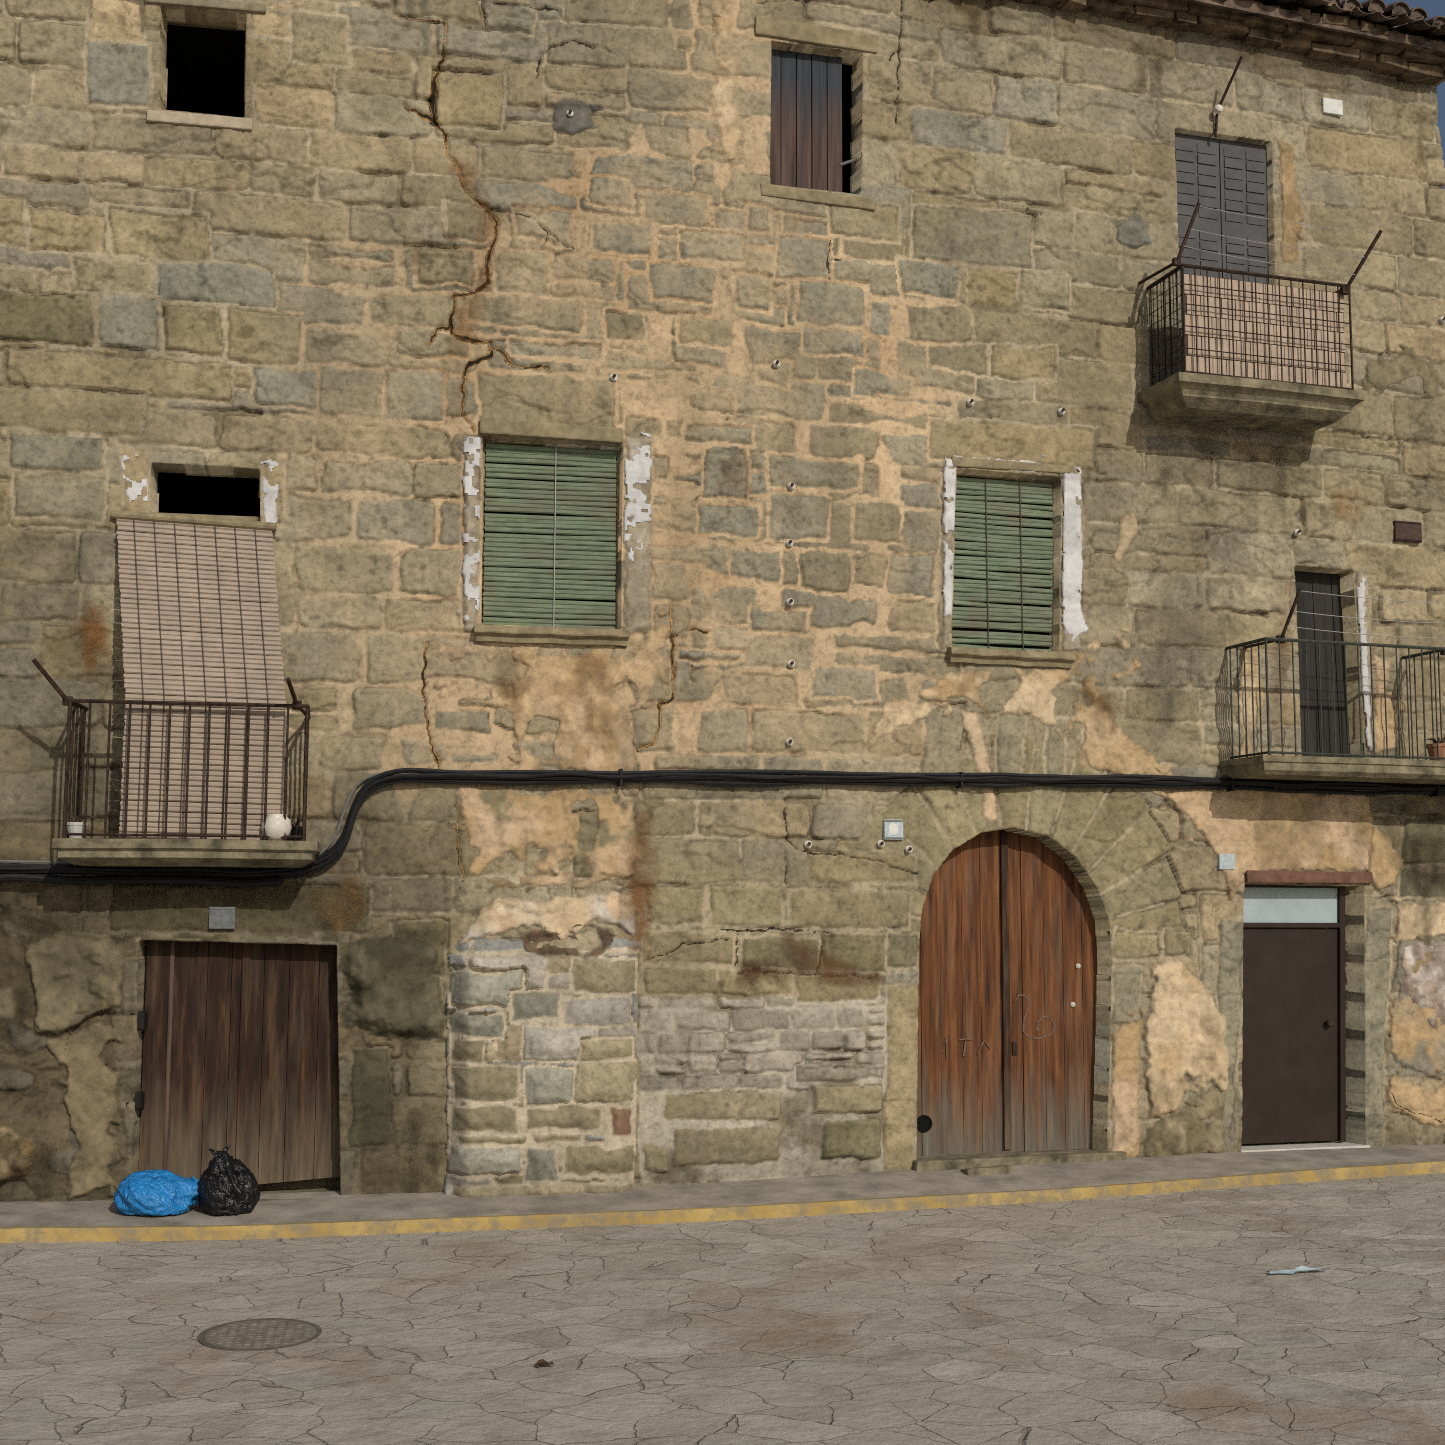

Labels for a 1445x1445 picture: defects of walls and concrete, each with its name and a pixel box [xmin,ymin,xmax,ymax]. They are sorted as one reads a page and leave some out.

crack [481,0,612,77]
crack [401,16,575,432]
peeling [462,436,481,518]
peeling [623,432,652,573]
peeling [457,533,480,621]
crack [421,642,441,769]
crack [455,802,465,880]
flaking render [864,455,1445,1157]
flaking render [25,931,124,1199]
spalling [0,1124,32,1179]